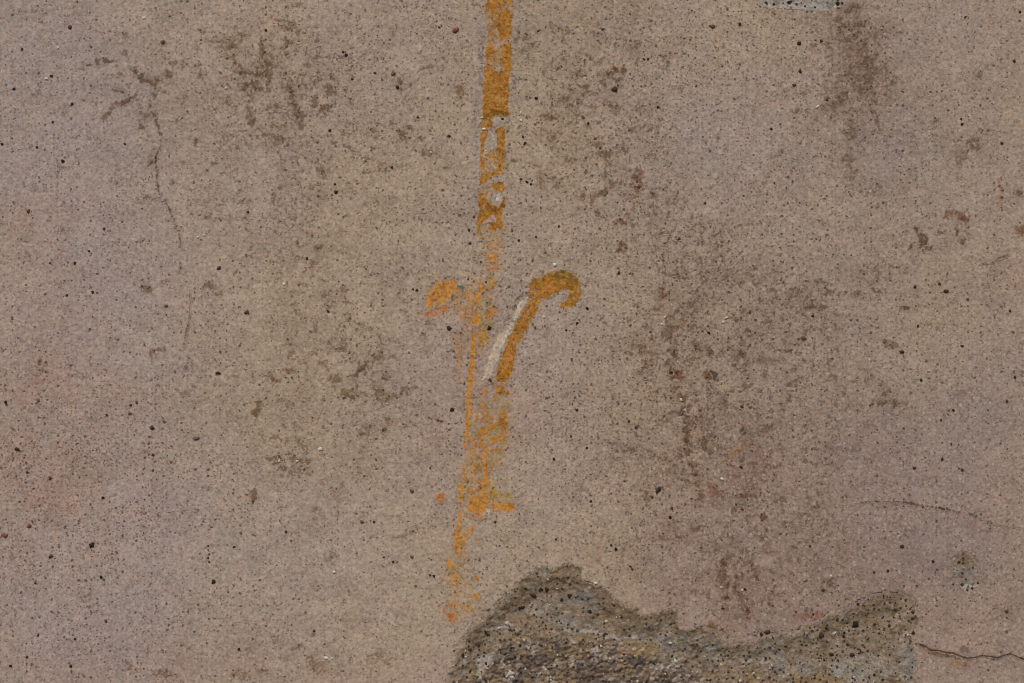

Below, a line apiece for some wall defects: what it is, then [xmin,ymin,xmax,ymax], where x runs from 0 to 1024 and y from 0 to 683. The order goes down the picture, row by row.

flaking render [759,0,846,15]
flaking render [444,562,920,683]
crack [914,636,1024,669]